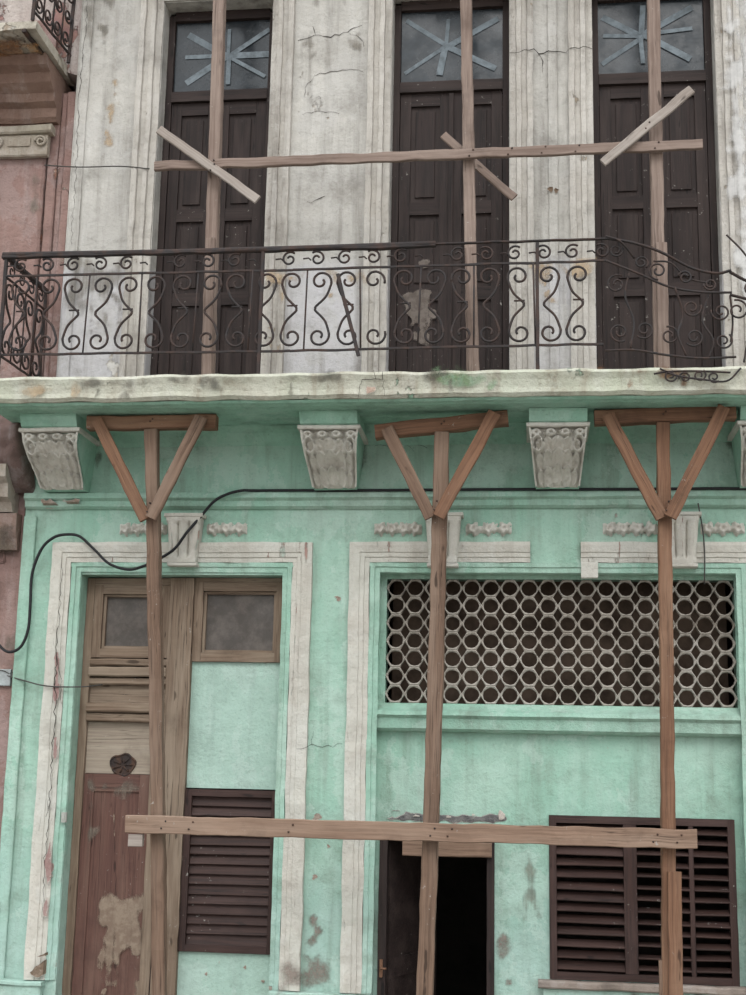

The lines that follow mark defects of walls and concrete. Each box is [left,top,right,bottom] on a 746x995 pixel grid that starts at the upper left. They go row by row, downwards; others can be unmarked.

crack [515,46,592,72]
water stain [308,915,322,944]
water stain [282,959,328,986]